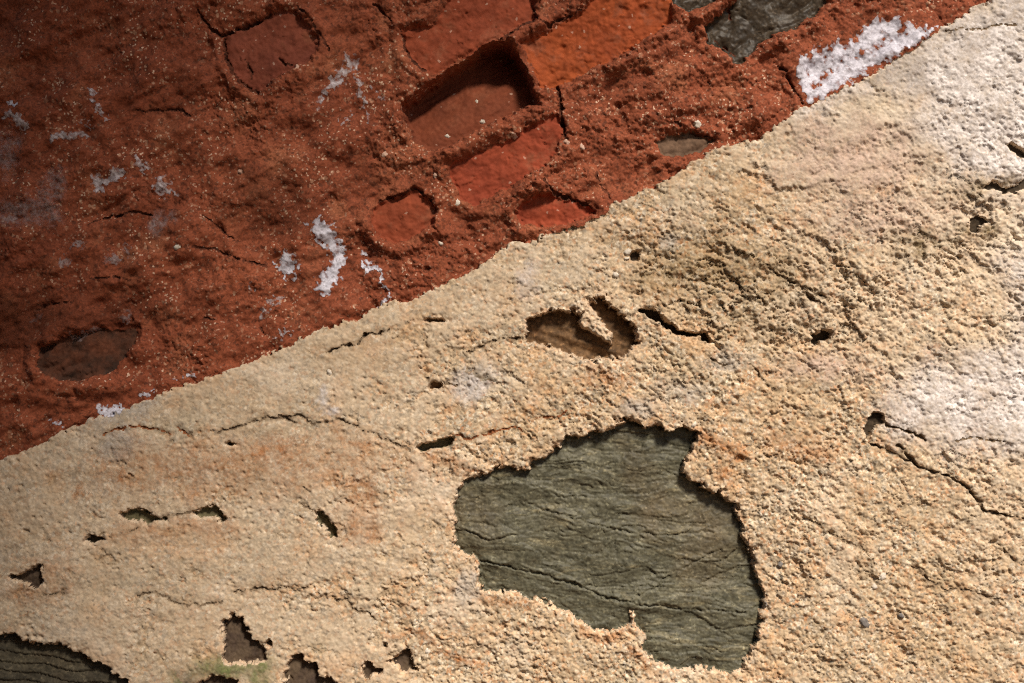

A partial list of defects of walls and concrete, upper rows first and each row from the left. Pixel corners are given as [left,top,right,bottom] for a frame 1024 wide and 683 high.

spalling [399,40,538,154]
spalling [524,293,713,364]
spalling [810,329,835,348]
crack [103,424,189,437]
crack [217,413,411,452]
spalling [415,436,455,453]
spalling [862,411,887,441]
crack [863,422,1024,521]
spalling [451,416,768,674]
spalling [0,631,130,683]
spalling [198,611,273,683]
spalling [281,653,337,683]